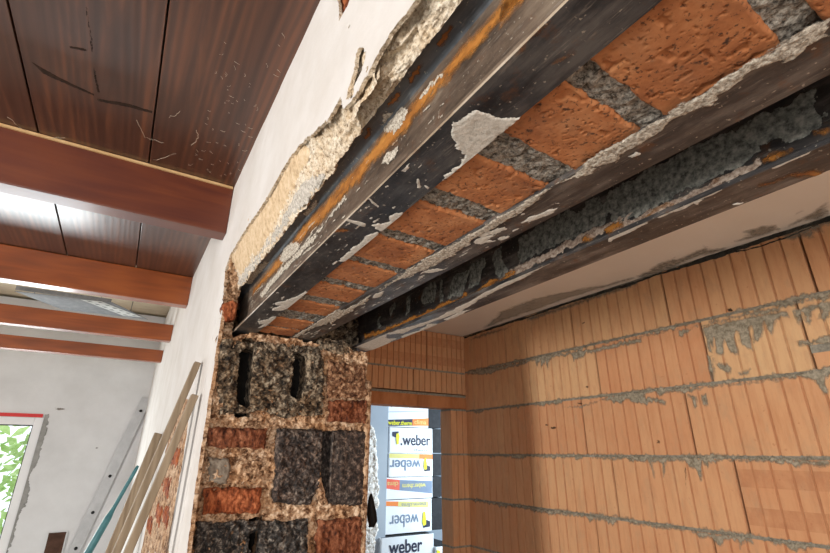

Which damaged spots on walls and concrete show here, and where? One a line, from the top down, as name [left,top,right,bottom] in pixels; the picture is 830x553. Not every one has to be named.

crack [33,11,152,113]
flaking render [231,0,463,290]
rust [292,0,523,244]
rust [253,257,283,294]
damp [472,398,569,414]
damp [468,292,830,408]